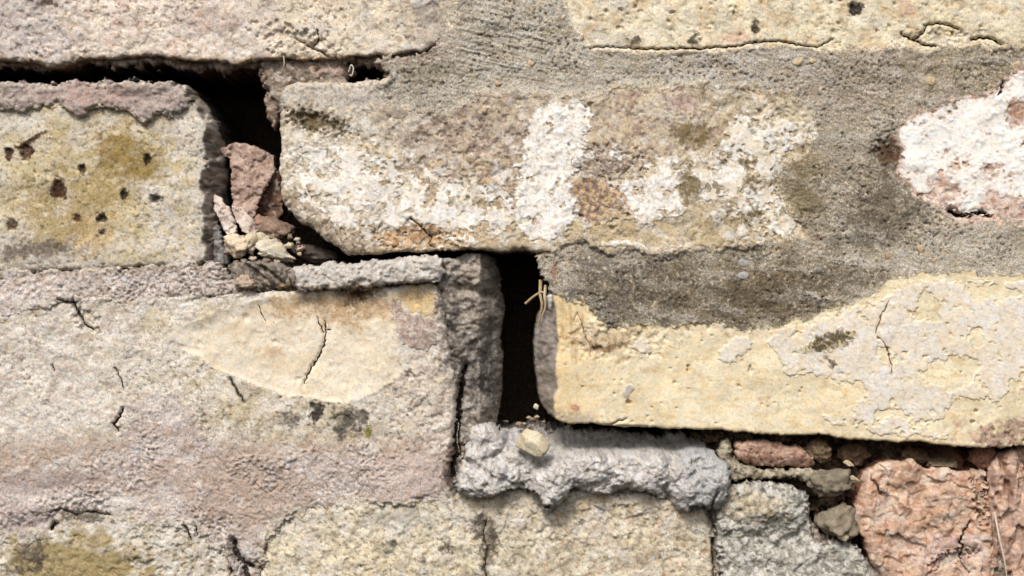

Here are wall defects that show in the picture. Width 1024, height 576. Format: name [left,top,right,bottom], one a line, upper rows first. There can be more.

crack [590,39,833,50]
crack [900,22,1001,47]
peeling [213,194,258,235]
crack [59,299,94,330]
crack [304,315,331,384]
crack [113,368,124,431]
crack [230,378,245,402]
crack [450,365,468,480]